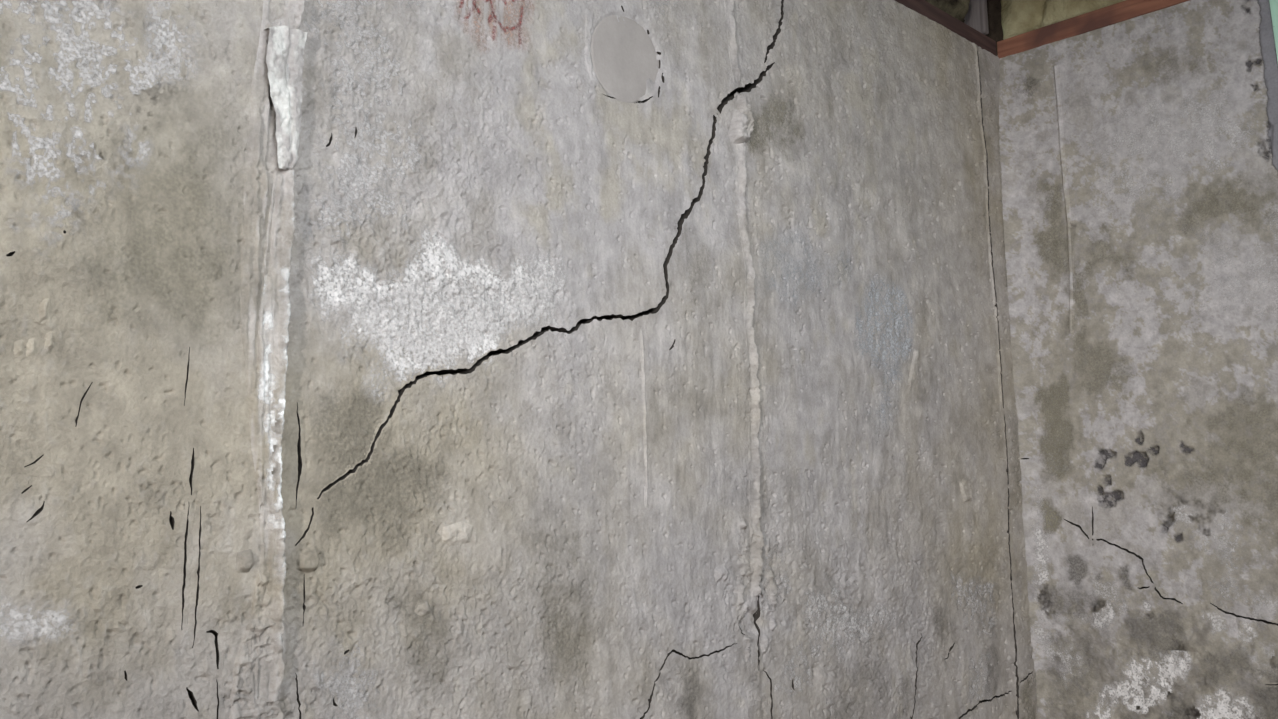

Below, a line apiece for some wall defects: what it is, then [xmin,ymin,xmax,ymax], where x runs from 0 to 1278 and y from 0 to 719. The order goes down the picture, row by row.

crack [295,0,784,625]
damp [1035,377,1072,477]
damp [1031,489,1132,680]
crack [1064,507,1278,626]
damp [1171,470,1278,642]
crack [294,673,302,719]
crack [640,585,773,719]
damp [1087,650,1278,719]